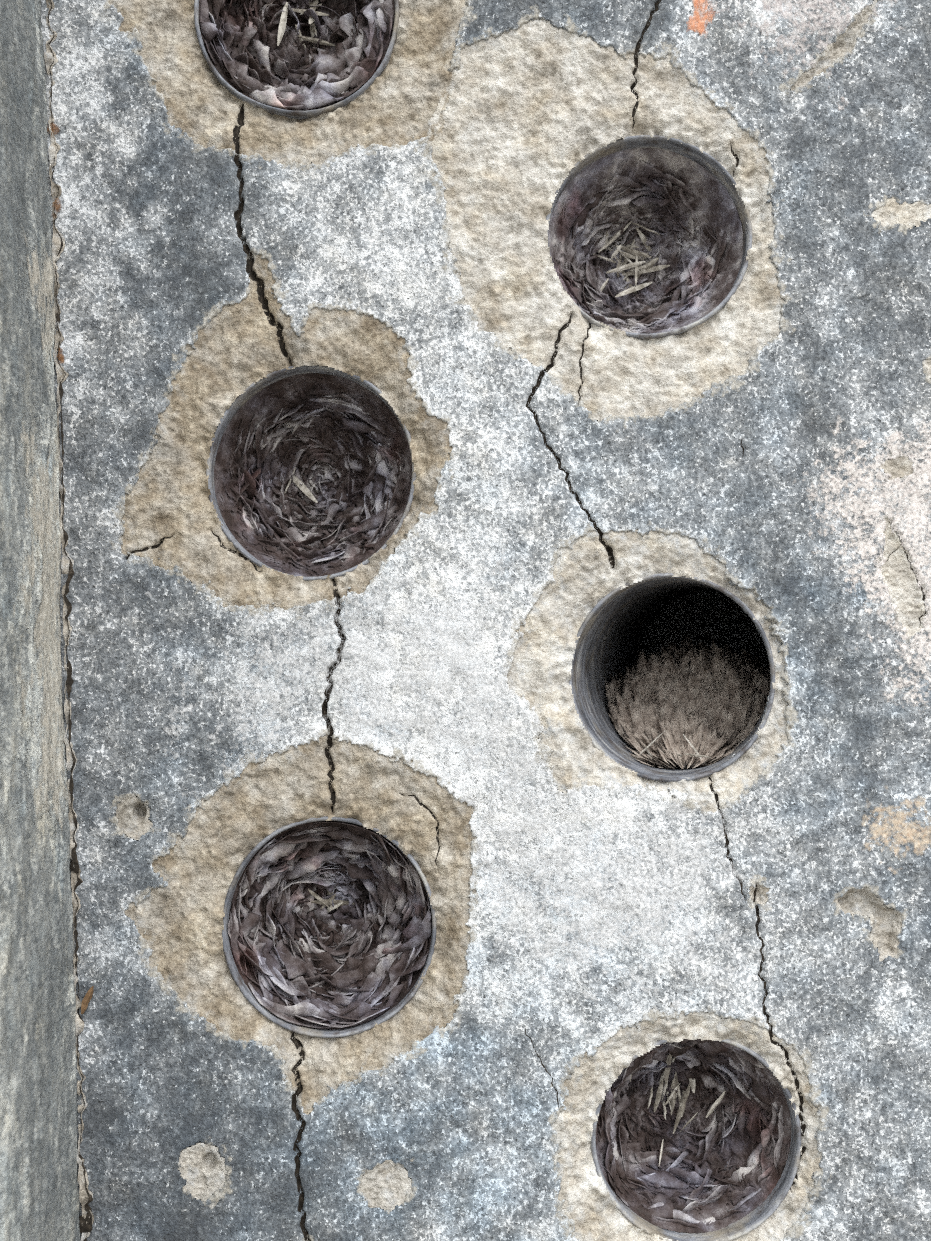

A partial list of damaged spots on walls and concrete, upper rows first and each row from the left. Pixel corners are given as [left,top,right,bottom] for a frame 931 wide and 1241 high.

crack [233,104,292,366]
crack [631,0,661,128]
crack [731,146,739,177]
crack [526,316,615,568]
crack [48,2,93,1241]
crack [126,536,172,560]
crack [211,530,261,572]
crack [322,579,346,812]
crack [290,1032,310,1241]
crack [523,1027,559,1108]
crack [709,776,806,1192]
spalling [833,885,907,961]